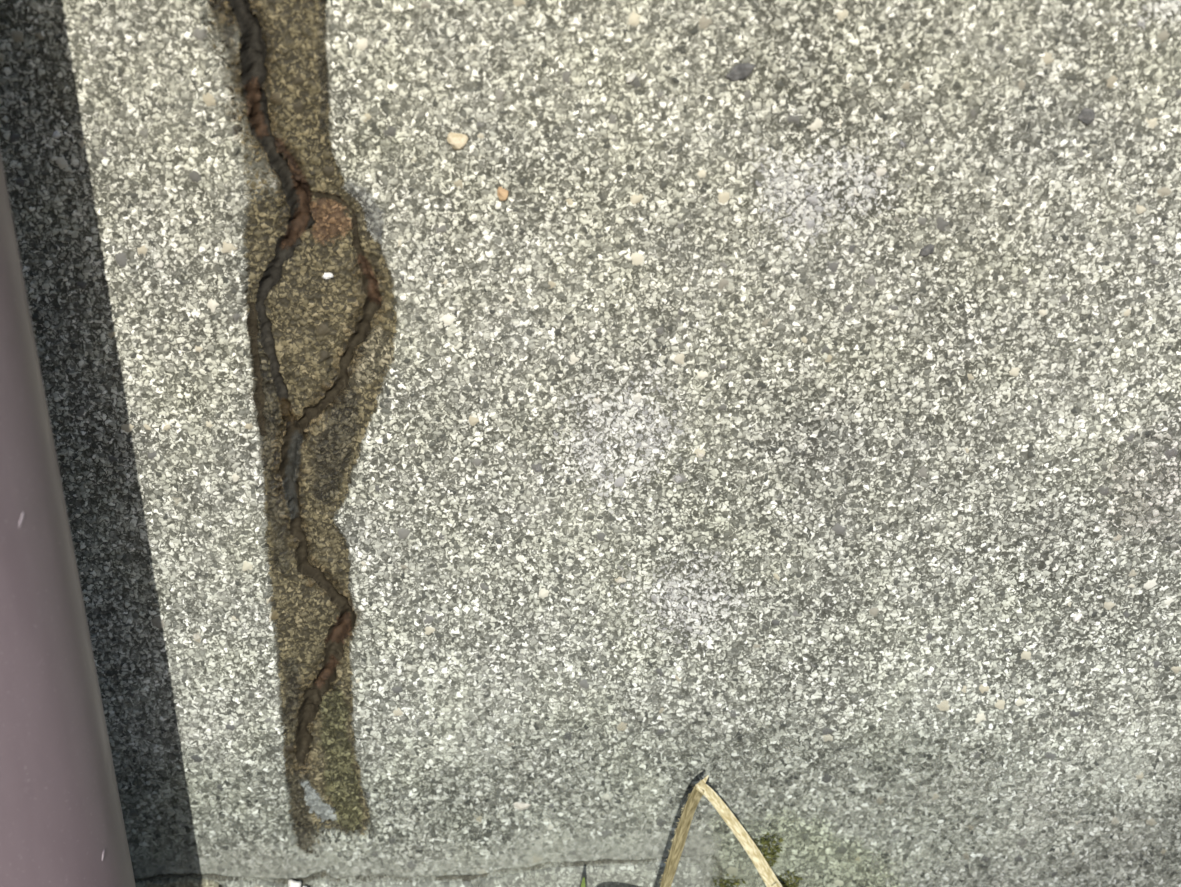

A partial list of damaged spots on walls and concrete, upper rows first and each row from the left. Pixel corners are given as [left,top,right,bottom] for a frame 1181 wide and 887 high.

crack [227,0,381,766]